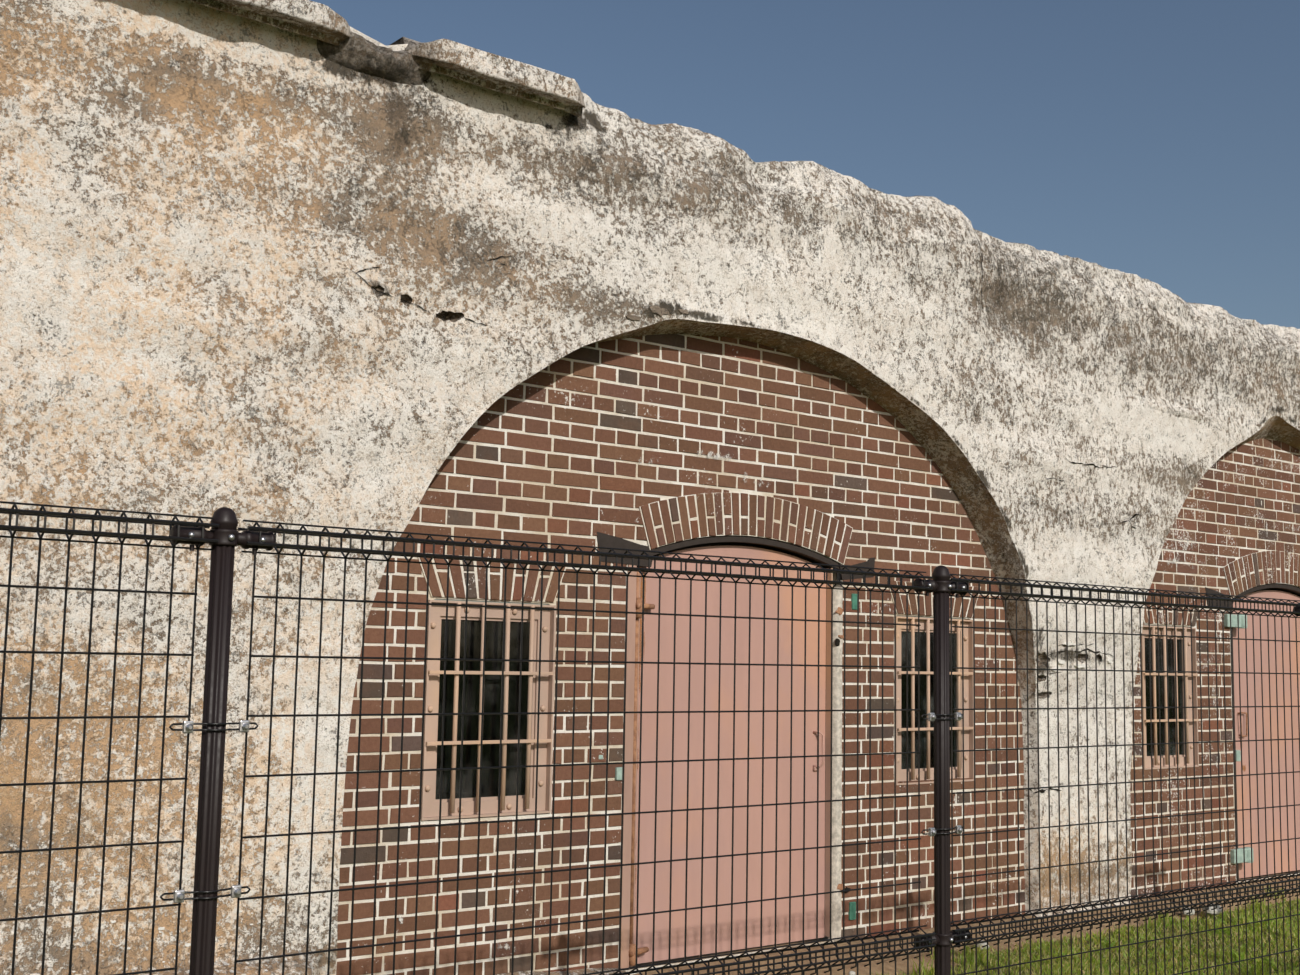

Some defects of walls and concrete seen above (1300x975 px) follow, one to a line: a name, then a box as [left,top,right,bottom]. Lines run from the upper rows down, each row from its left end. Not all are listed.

spalling [371,285,385,298]
spalling [436,310,464,322]
spalling [1031,642,1112,699]